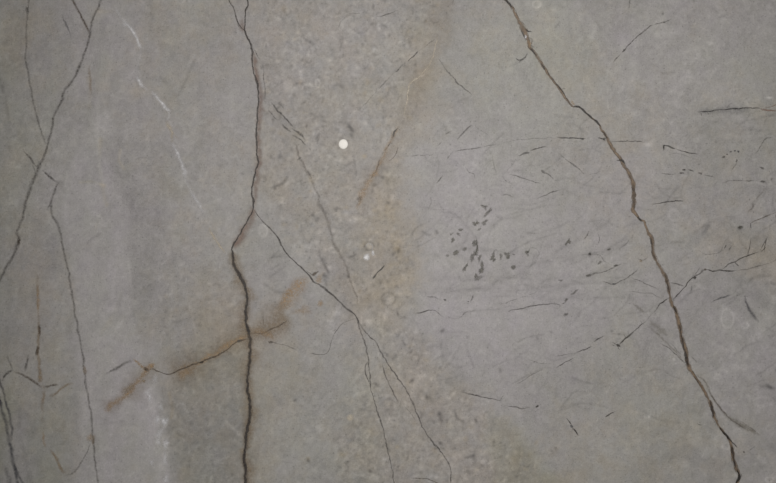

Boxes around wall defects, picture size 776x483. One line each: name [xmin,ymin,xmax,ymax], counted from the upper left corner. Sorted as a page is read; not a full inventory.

crack [229,0,451,483]
crack [505,0,766,483]